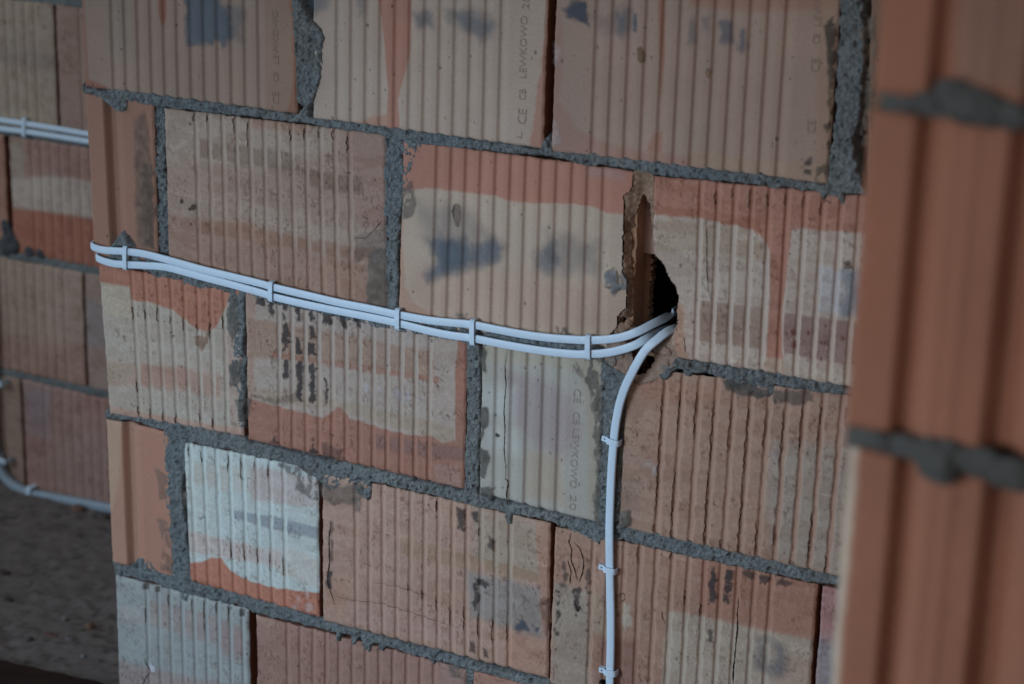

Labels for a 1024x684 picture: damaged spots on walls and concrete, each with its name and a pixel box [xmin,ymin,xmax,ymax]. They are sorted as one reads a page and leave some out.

spalling [603,170,679,385]
crack [502,354,510,500]
crack [568,533,584,612]